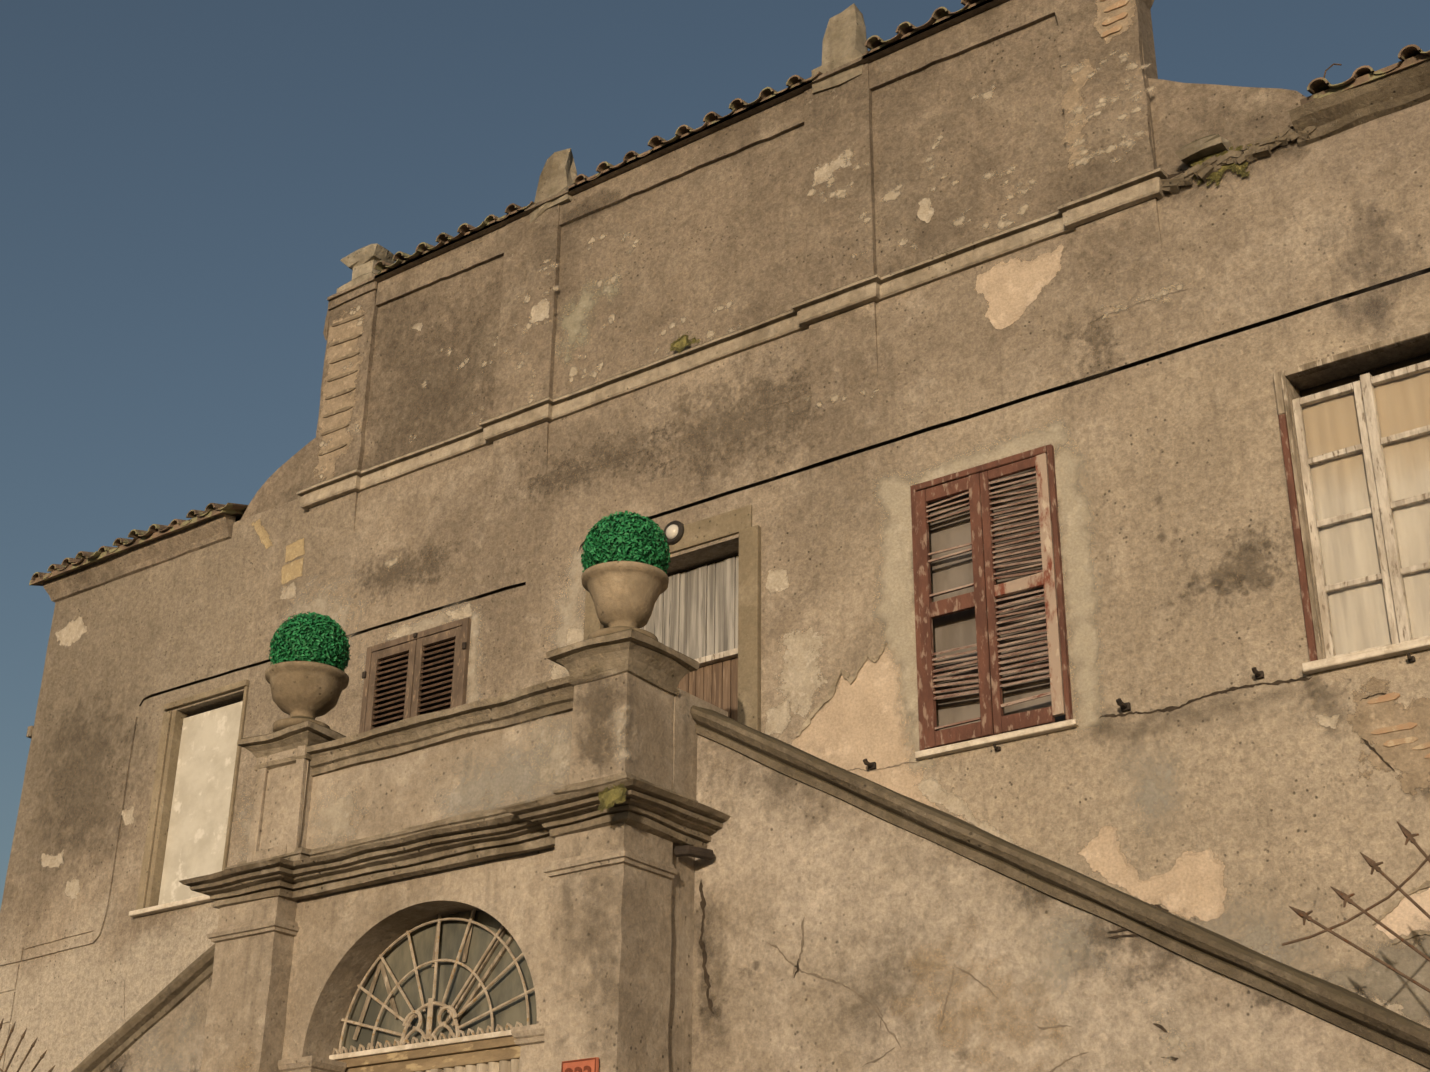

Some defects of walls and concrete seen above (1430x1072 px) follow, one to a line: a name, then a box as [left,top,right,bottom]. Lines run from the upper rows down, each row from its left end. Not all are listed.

flaking render [1060,0,1154,170]
peeling [807,149,869,202]
flaking render [975,244,1064,330]
flaking render [55,614,88,647]
flaking render [765,626,1019,846]
crack [1100,676,1313,718]
flaking render [1316,677,1430,796]
crack [699,880,714,1014]
flaking render [1077,825,1227,922]
flaking render [1372,880,1430,944]